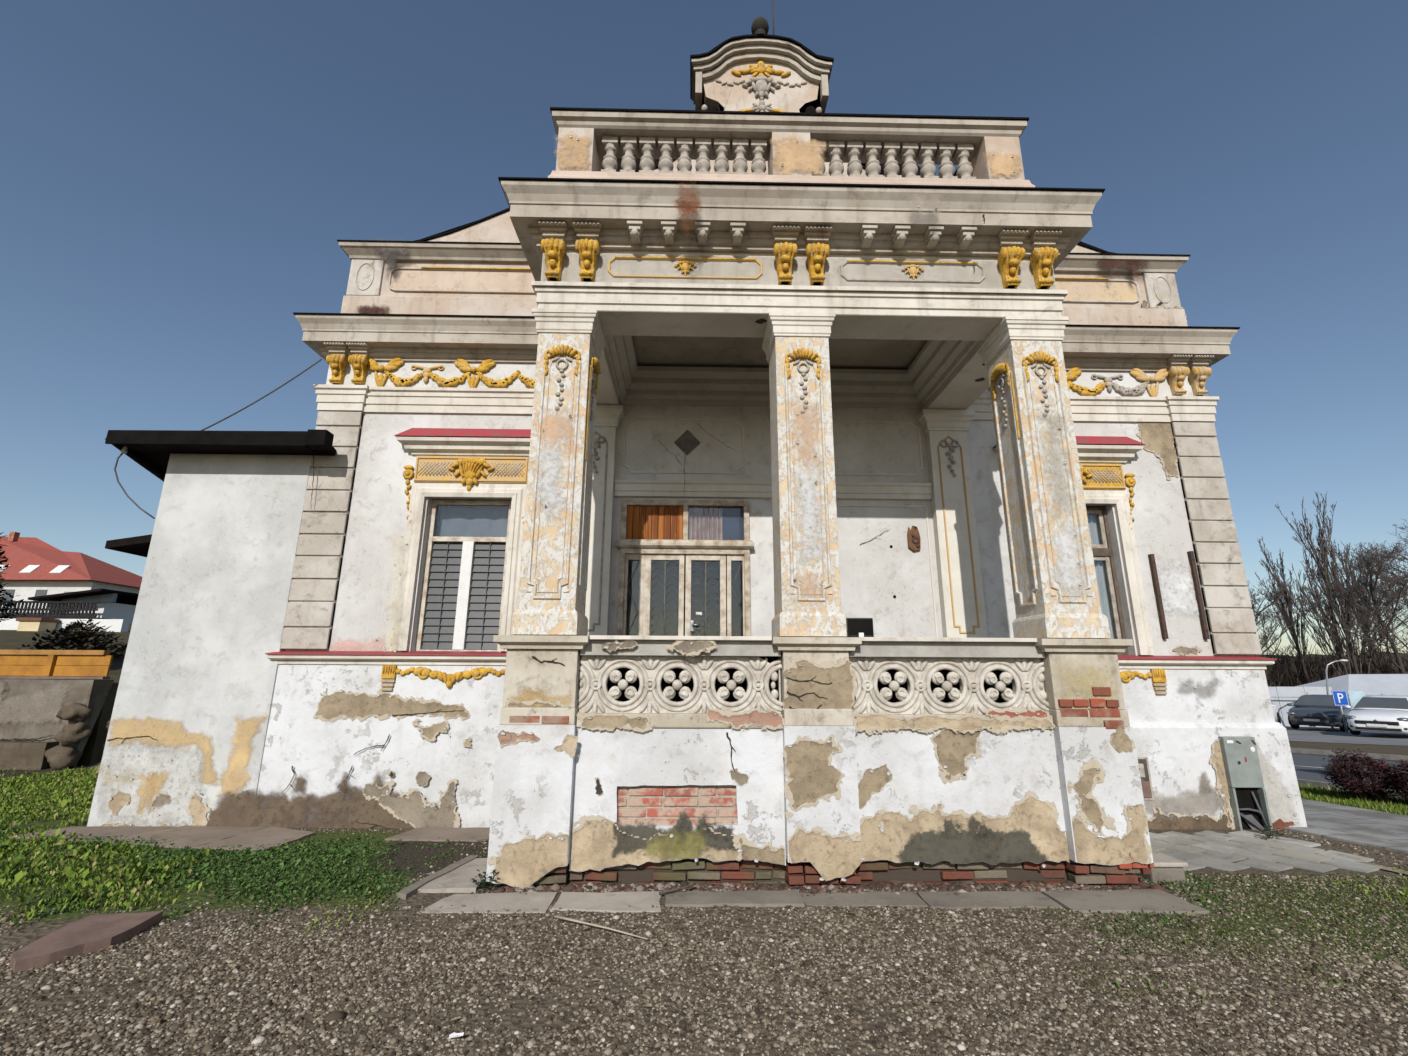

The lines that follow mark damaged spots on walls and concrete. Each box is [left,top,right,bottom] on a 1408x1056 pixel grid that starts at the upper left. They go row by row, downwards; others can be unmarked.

rust [676,186,699,229]
peeling [1132,422,1179,480]
peeling [313,688,472,747]
crack [786,676,832,709]
peeling [99,744,212,827]
water stain [109,716,414,828]
crack [726,732,736,772]
peeling [488,657,1235,888]
water stain [613,811,738,861]
water stain [898,816,1047,865]